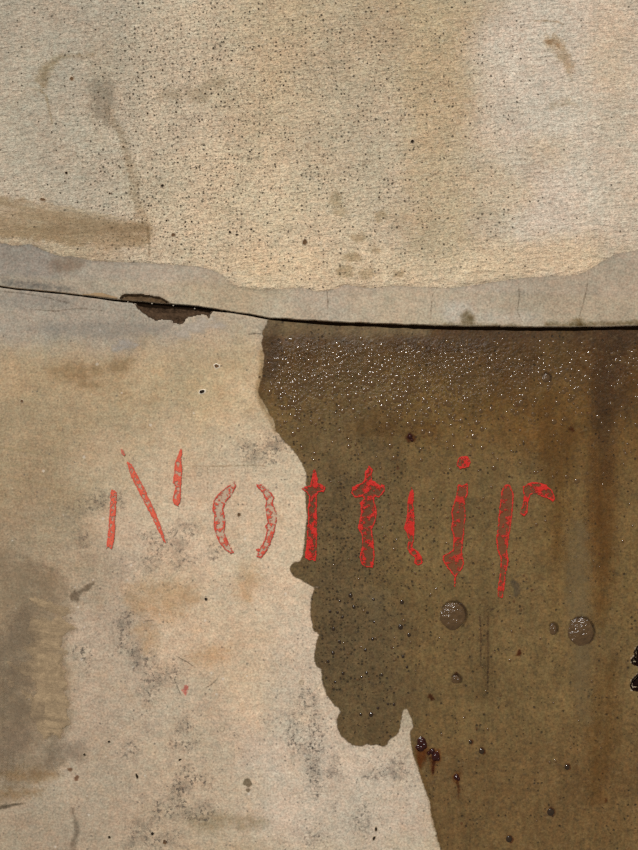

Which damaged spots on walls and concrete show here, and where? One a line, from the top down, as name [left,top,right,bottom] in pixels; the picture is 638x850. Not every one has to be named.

spalling [82,293,213,324]
crack [0,286,638,331]
damp [241,320,638,850]
corrosion [415,737,440,761]